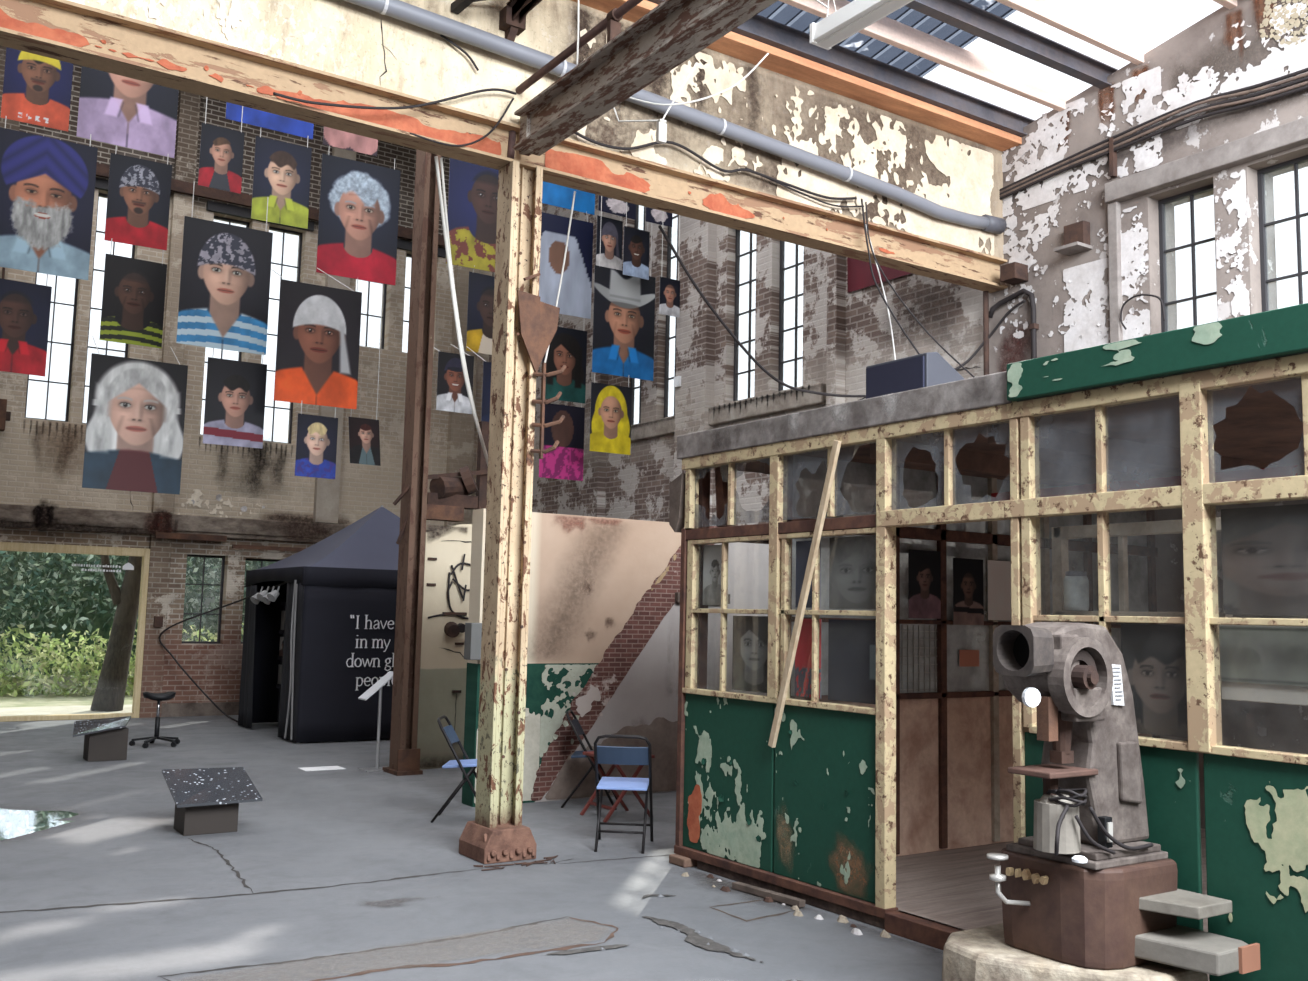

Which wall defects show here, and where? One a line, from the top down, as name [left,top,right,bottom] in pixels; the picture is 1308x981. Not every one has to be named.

peeling [670,52,747,125]
peeling [545,125,651,193]
peeling [620,114,667,165]
peeling [688,2,1308,381]
peeling [1007,363,1023,397]
flaking render [523,546,681,801]
peeling [684,701,766,868]
rust [830,843,867,894]
peeling [1244,781,1308,913]